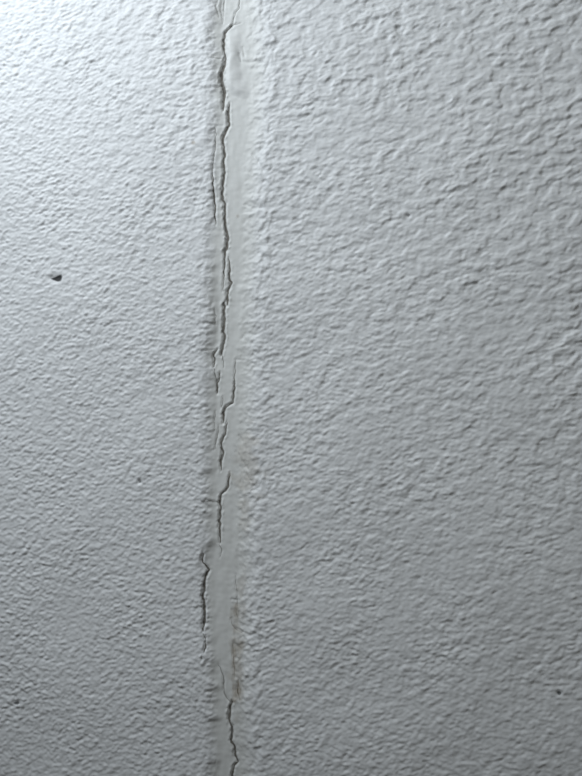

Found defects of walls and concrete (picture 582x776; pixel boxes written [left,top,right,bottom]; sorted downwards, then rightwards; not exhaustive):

crack [212,27,236,542]
crack [202,553,210,651]
crack [228,701,239,776]